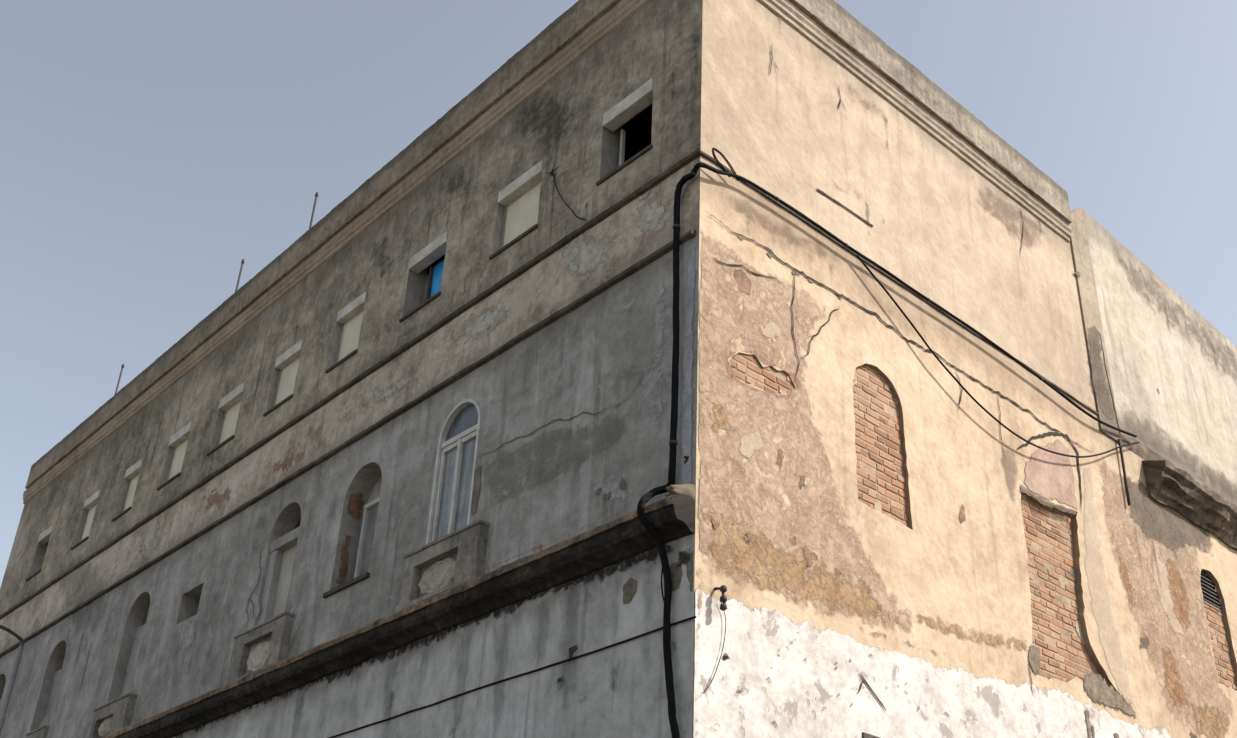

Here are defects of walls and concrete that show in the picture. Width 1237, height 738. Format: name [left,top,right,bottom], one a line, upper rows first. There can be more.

crack [246,548,261,617]
flaking render [338,535,351,583]
flaking render [347,491,364,519]
flaking render [471,379,641,514]
peeling [623,578,637,604]
crack [711,215,1090,511]
peeling [670,232,1174,738]
crack [1100,333,1124,450]
peeling [1100,463,1232,738]